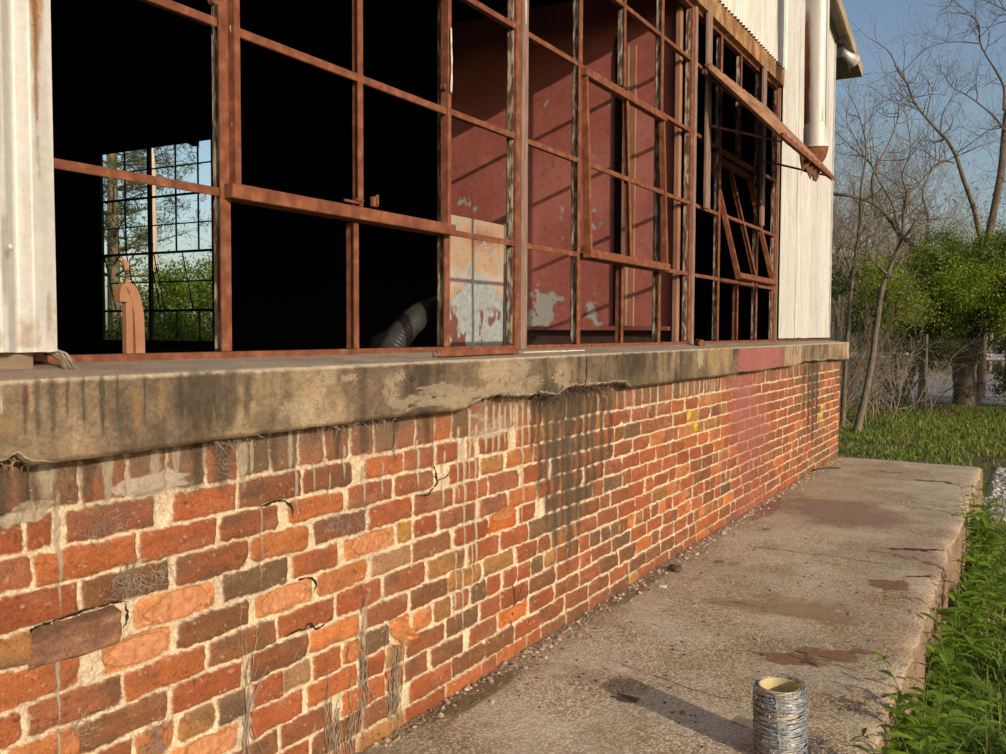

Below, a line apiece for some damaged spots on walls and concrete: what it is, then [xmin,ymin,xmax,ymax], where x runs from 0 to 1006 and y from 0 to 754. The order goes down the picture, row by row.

corrosion [31,0,41,70]
crack [414,466,449,497]
crack [261,499,294,517]
crack [298,577,317,591]
crack [29,600,129,637]
crack [286,616,332,637]